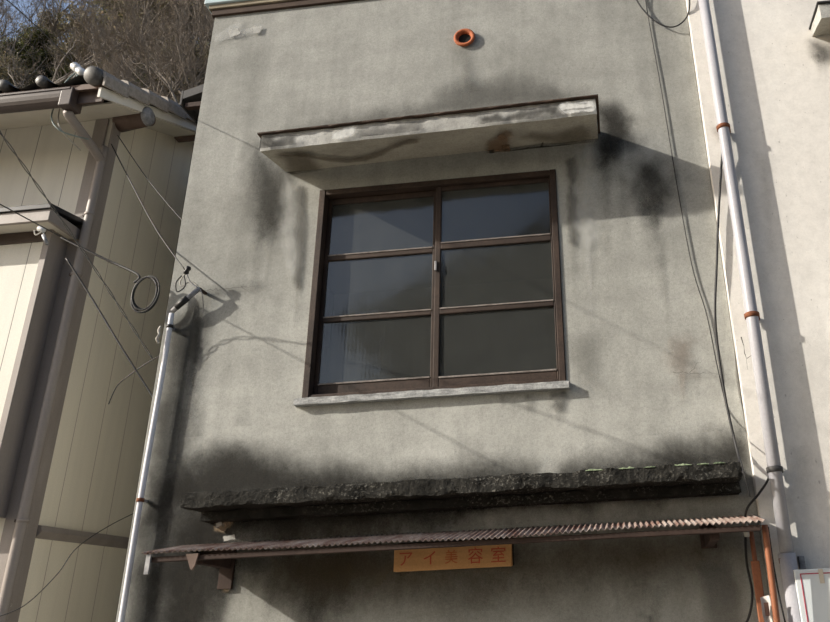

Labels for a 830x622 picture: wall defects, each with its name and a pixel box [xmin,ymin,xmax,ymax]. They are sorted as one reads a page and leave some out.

water stain [599,106,632,166]
water stain [257,157,284,229]
water stain [640,164,668,207]
water stain [294,186,305,287]